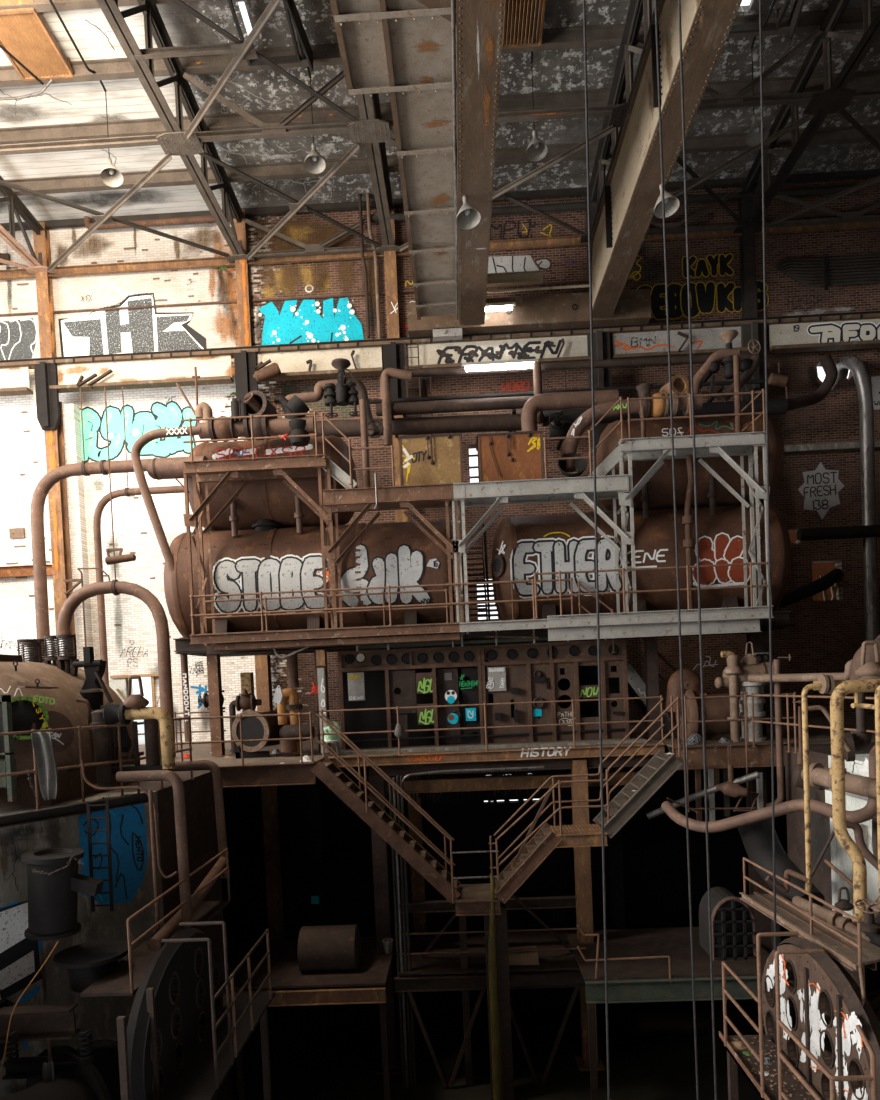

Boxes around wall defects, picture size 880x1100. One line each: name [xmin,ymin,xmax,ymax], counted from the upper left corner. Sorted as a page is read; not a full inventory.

corrosion [48,430,56,470]